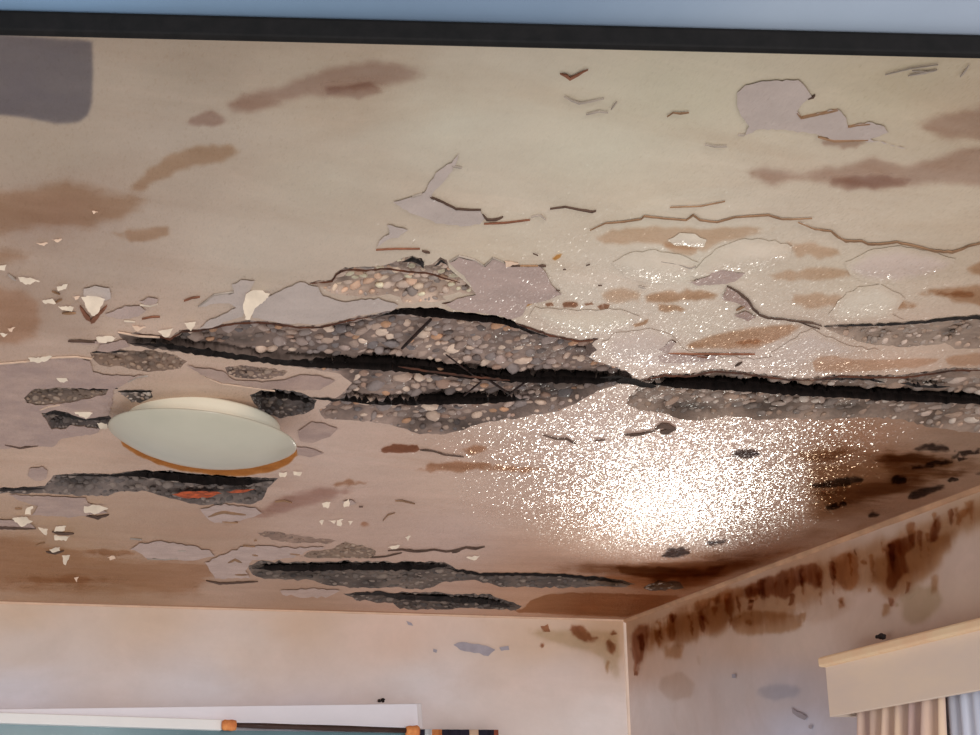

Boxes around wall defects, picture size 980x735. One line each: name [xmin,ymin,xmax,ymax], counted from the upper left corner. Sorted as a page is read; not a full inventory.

peeling [737,80,905,149]
peeling [394,154,596,227]
crack [590,201,980,254]
crack [727,286,822,330]
spalling [0,225,980,457]
spalling [0,467,302,565]
rust [172,489,254,499]
mould [812,477,863,488]
mould [892,444,979,499]
spalling [130,531,684,626]
water stain [662,547,689,558]